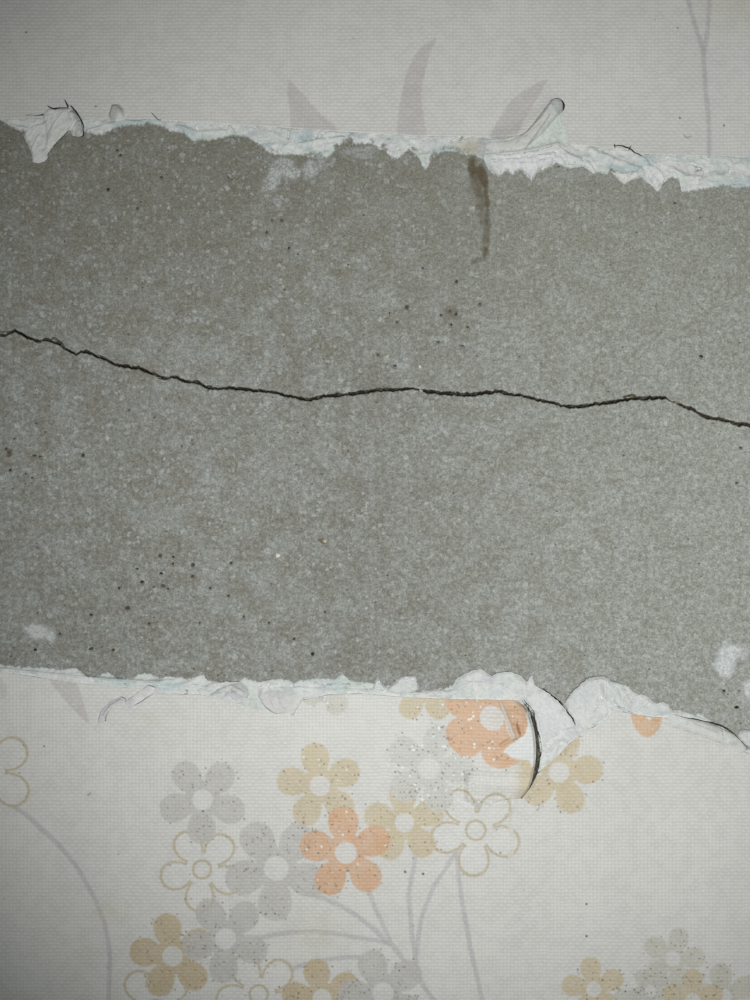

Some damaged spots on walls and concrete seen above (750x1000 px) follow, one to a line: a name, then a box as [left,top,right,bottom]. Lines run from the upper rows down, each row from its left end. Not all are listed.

peeling [24,100,84,164]
peeling [479,98,570,157]
crack [0,329,750,427]
peeling [538,676,747,772]